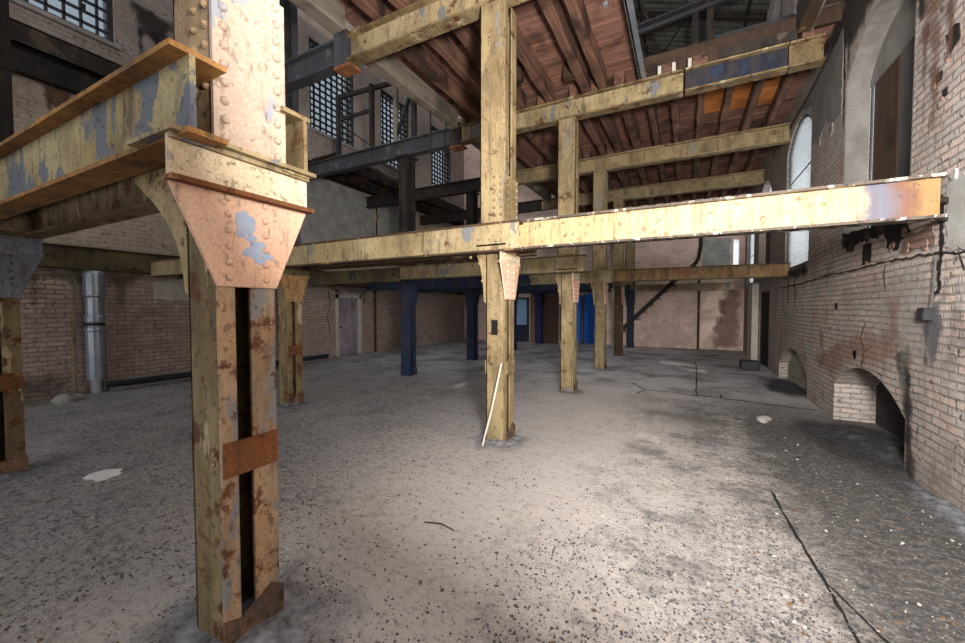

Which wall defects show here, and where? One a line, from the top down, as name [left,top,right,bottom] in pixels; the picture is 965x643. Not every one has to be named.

peeling [236,211,274,266]
crack [779,194,965,356]
spalling [841,223,936,266]
crack [770,490,890,643]